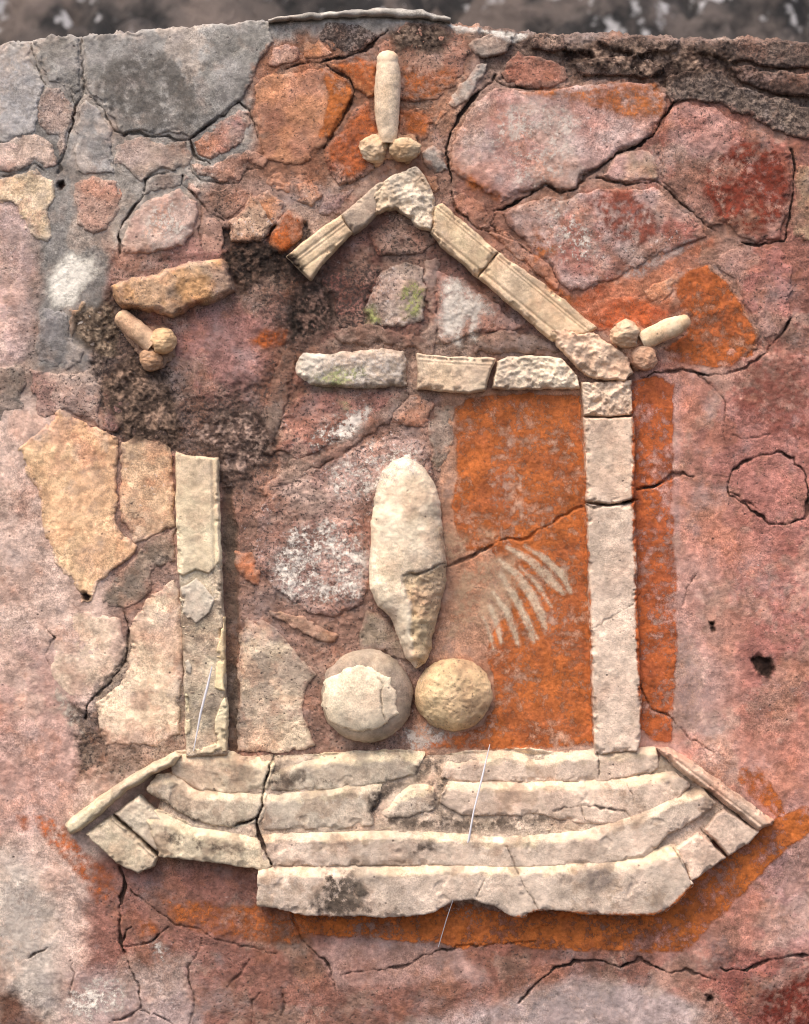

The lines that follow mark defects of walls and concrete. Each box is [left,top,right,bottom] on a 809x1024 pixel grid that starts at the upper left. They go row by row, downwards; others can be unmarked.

crack [615,472,692,504]
crack [727,451,809,525]
crack [118,871,180,951]
crack [518,959,665,1004]
crack [721,962,764,972]